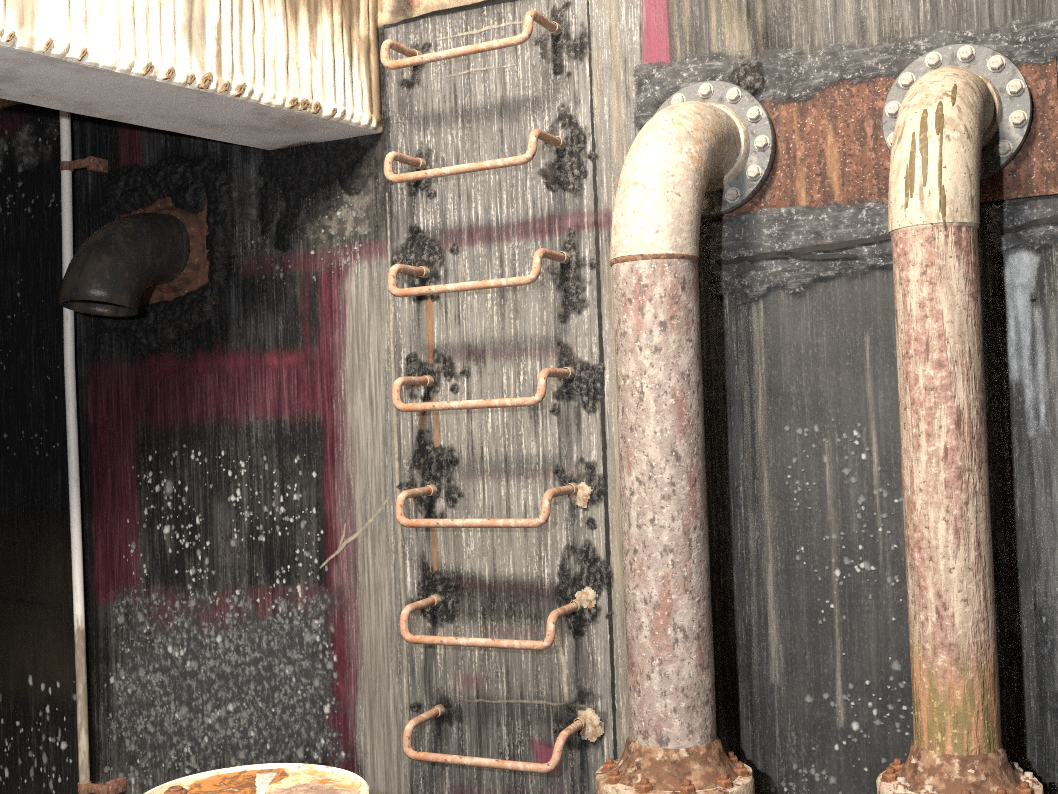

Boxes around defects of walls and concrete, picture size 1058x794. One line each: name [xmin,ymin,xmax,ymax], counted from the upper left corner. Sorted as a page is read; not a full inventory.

damp [6,0,34,49]
damp [181,0,209,70]
damp [216,25,225,92]
damp [289,0,357,57]
corrosion [420,412,439,464]
damp [103,445,346,787]
damp [0,530,76,793]